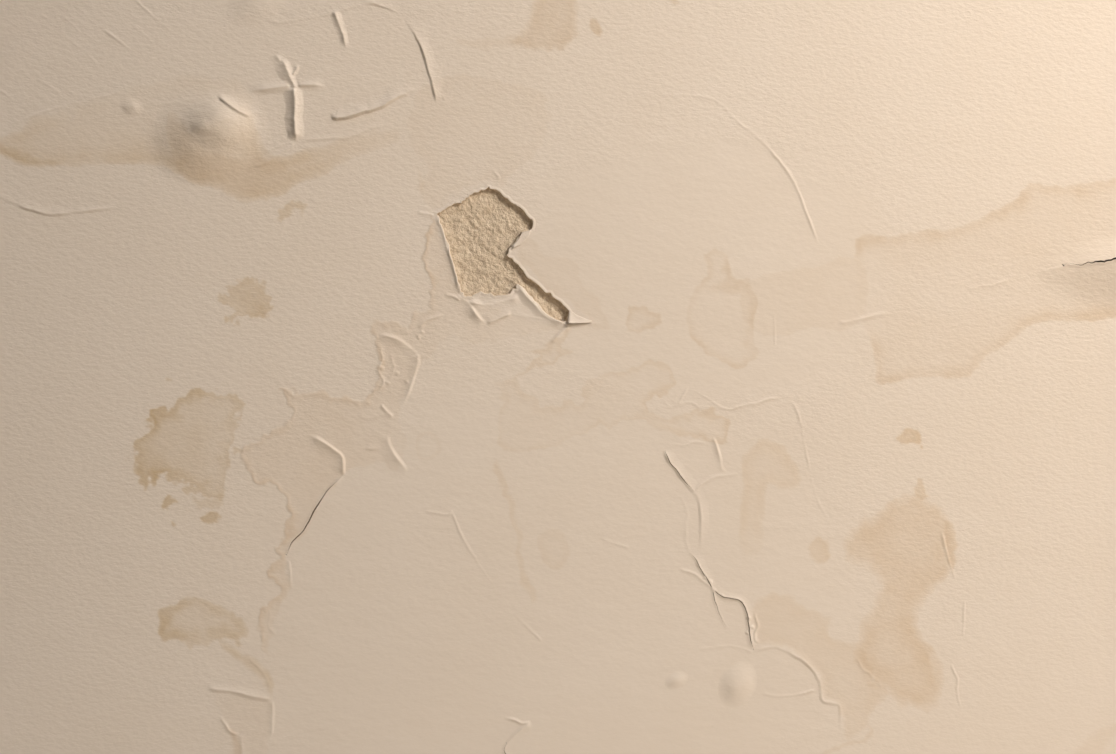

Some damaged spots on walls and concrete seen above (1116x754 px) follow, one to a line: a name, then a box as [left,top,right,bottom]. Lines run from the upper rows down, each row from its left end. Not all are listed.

leakage [0,74,246,169]
leakage [209,128,401,225]
leakage [216,275,275,328]
spalling [417,170,602,345]
leakage [685,177,1116,386]
crack [1062,255,1116,268]
leakage [124,386,247,528]
crack [285,474,344,555]
crack [663,449,695,493]
leakage [156,594,276,695]
crack [688,551,756,650]
leakage [743,477,960,754]